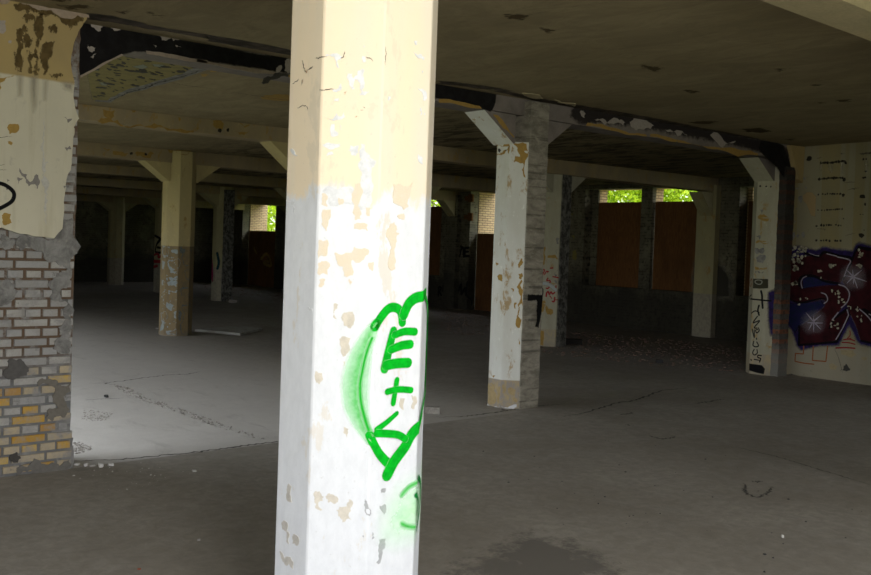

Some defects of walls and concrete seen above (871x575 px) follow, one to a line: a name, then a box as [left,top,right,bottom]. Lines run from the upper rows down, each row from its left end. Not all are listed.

peeling [80,36,291,135]
peeling [7,124,19,145]
peeling [554,99,758,157]
peeling [6,168,40,190]
peeling [317,112,376,287]
peeling [386,183,413,271]
peeling [160,246,192,335]
peeling [511,259,524,328]
peeling [333,303,355,365]
peeling [313,491,353,522]
peeling [363,533,386,564]